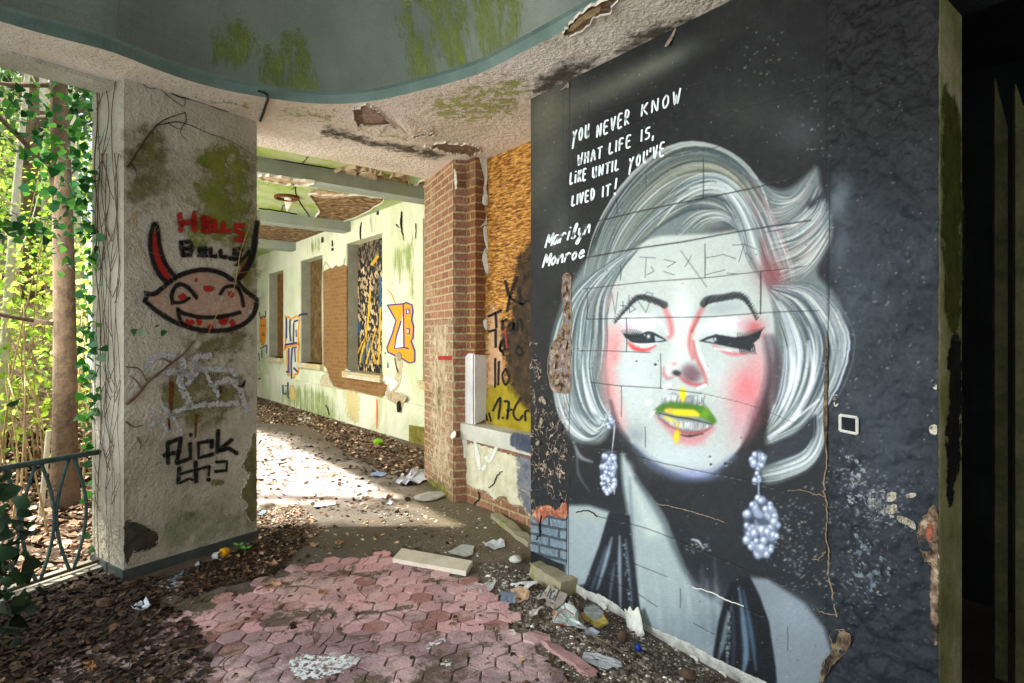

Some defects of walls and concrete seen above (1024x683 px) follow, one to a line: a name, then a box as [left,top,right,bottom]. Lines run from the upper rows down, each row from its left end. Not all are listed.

leakage [402,0,519,78]
flaking render [562,0,618,38]
flaking render [351,103,396,135]
spalling [257,173,384,222]
flaking render [411,132,489,275]
flaking render [470,272,572,565]
flaking render [240,433,258,523]
peeling [885,333,964,646]
flaking render [123,520,160,566]
crack [788,446,837,617]
flaking render [819,629,851,682]